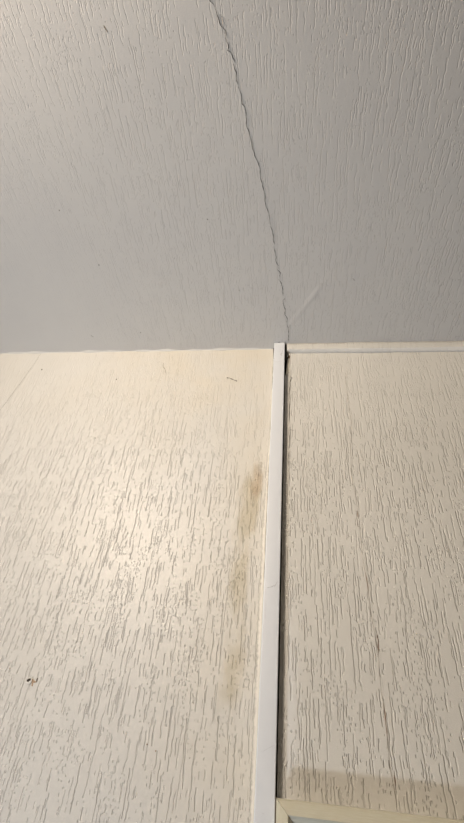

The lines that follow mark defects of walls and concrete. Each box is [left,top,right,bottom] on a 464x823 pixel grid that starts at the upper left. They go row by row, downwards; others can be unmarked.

crack [209,0,289,355]
crack [263,372,294,589]